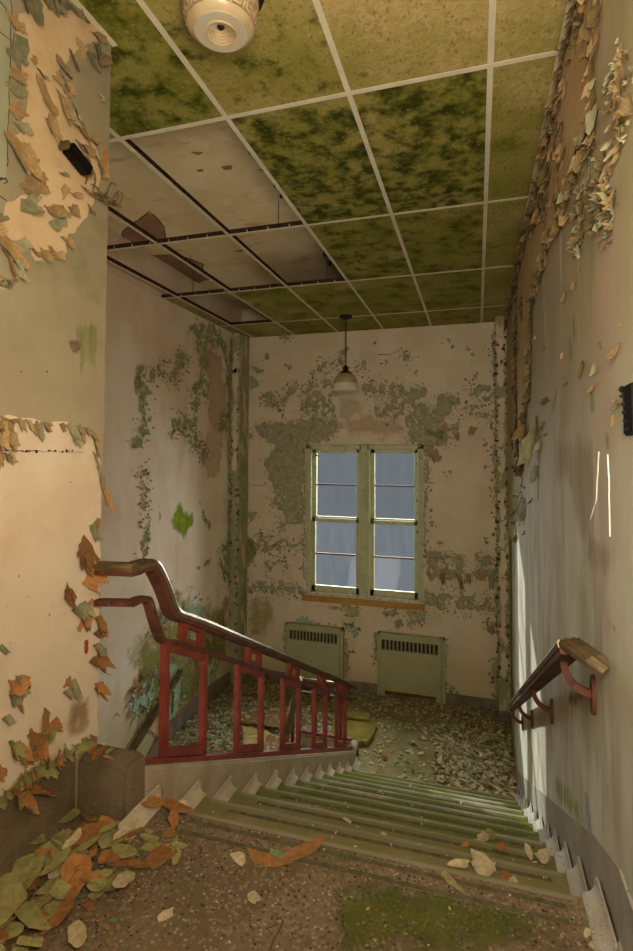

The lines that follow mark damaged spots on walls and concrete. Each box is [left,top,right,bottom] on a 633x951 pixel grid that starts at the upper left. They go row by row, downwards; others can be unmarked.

crack [0,0,12,201]
peeling [0,0,113,290]
peeling [117,0,633,798]
peeling [0,415,117,815]